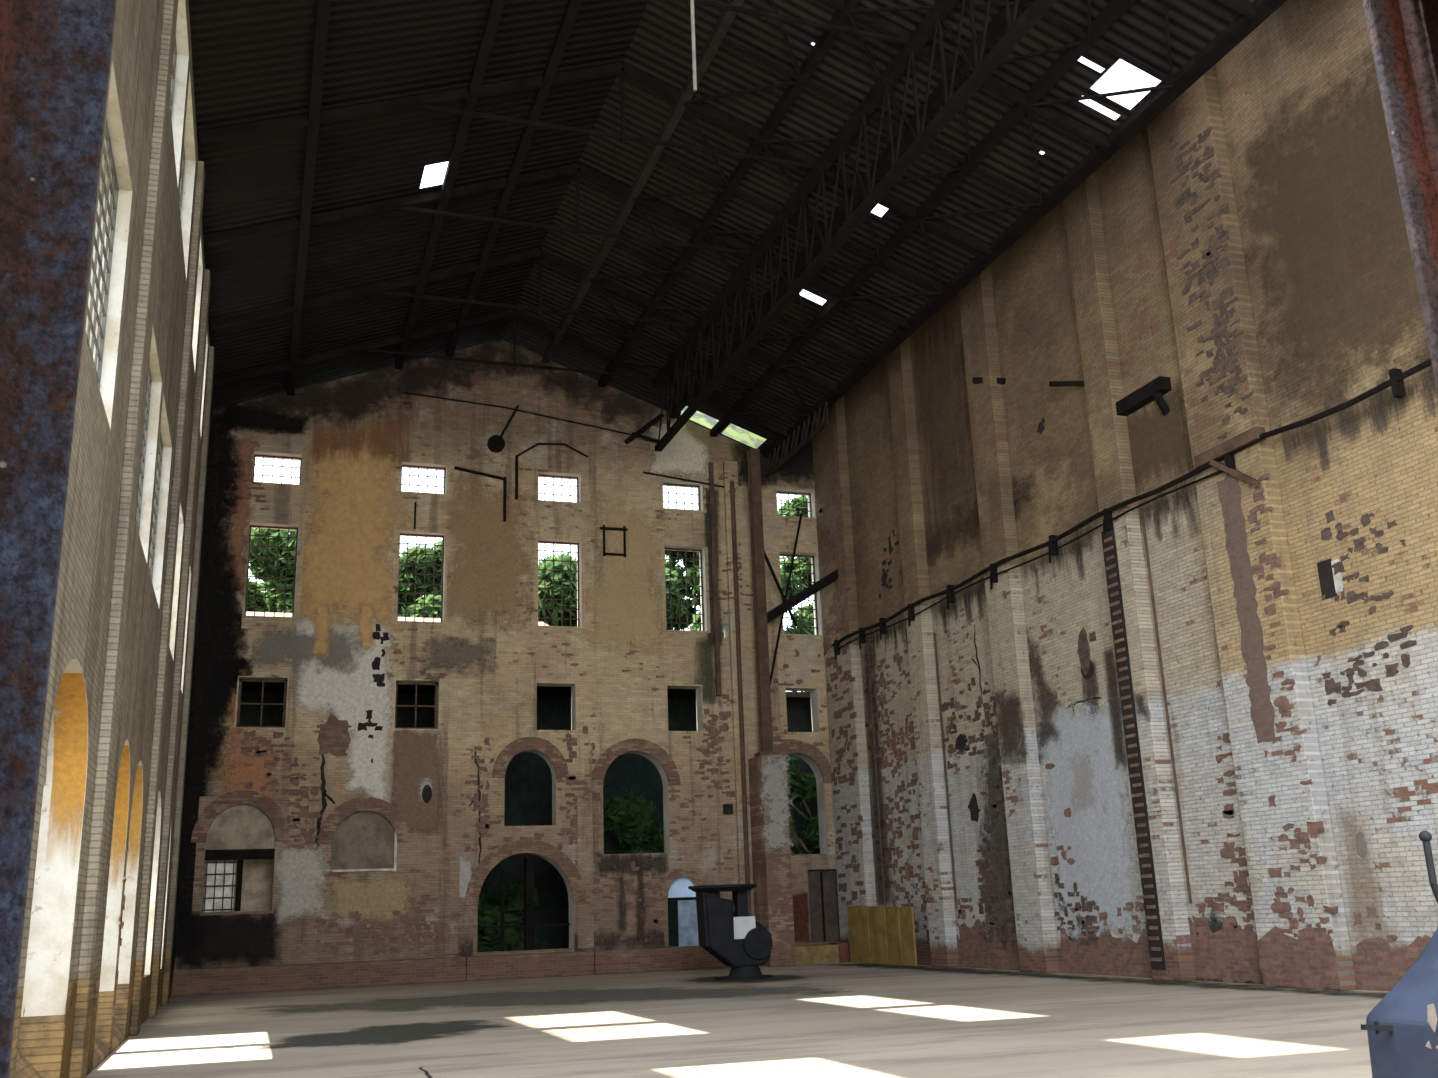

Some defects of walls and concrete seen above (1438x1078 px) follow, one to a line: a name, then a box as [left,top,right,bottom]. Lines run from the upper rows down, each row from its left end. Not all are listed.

damp [1243,53,1437,470]
spalling [1321,510,1406,615]
spalling [372,624,390,687]
spalling [1077,628,1096,679]
flaking render [1216,473,1308,762]
spalling [1329,621,1350,636]
peeling [1322,625,1417,707]
crack [313,755,336,852]
flaking render [942,677,1019,970]
flaking render [1051,845,1153,978]
flaking render [1188,733,1431,991]